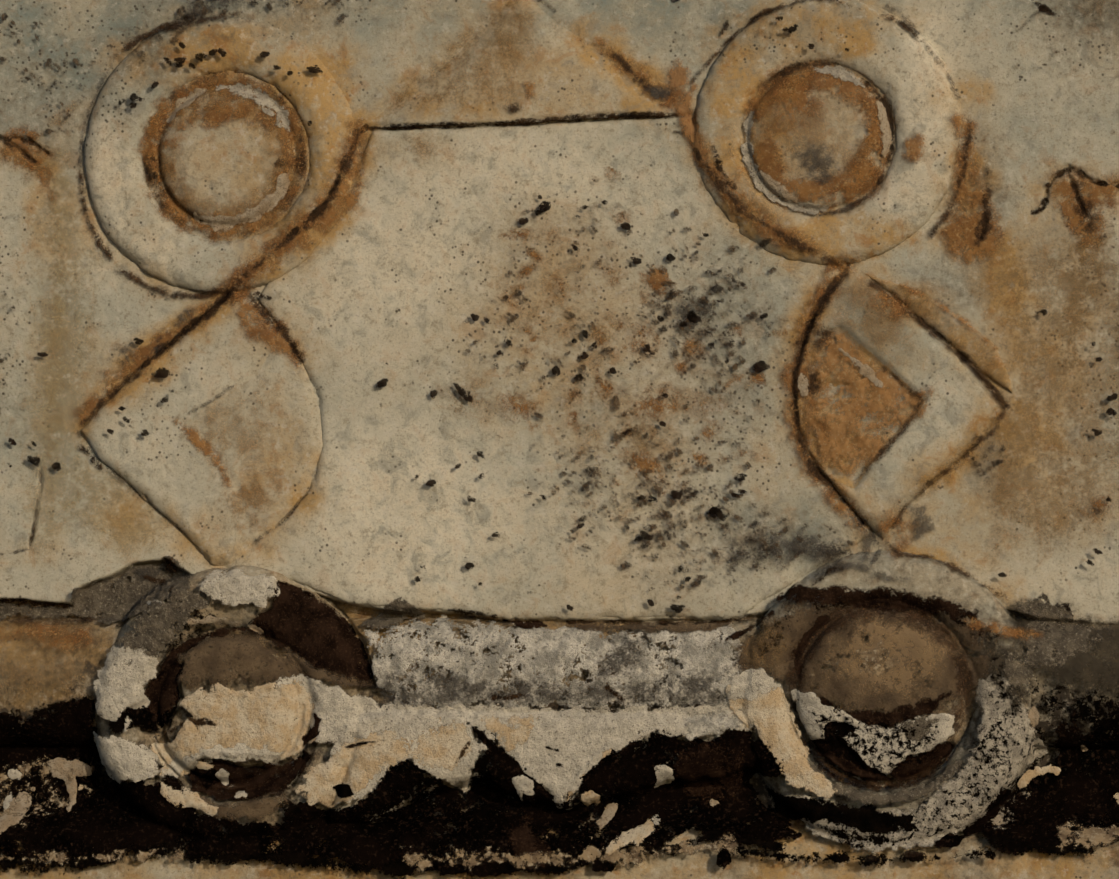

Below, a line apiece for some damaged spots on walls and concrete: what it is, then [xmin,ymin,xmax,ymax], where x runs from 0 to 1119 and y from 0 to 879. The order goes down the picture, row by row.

rust [508,82,535,113]
crack [0,137,49,163]
crack [348,111,689,161]
crack [1031,167,1119,218]
rust [1052,174,1119,249]
rust [597,39,1010,562]
water stain [502,195,1028,740]
flaking render [0,556,1119,854]
water stain [0,677,1119,879]
peeling [0,848,184,865]
peeling [403,814,738,873]